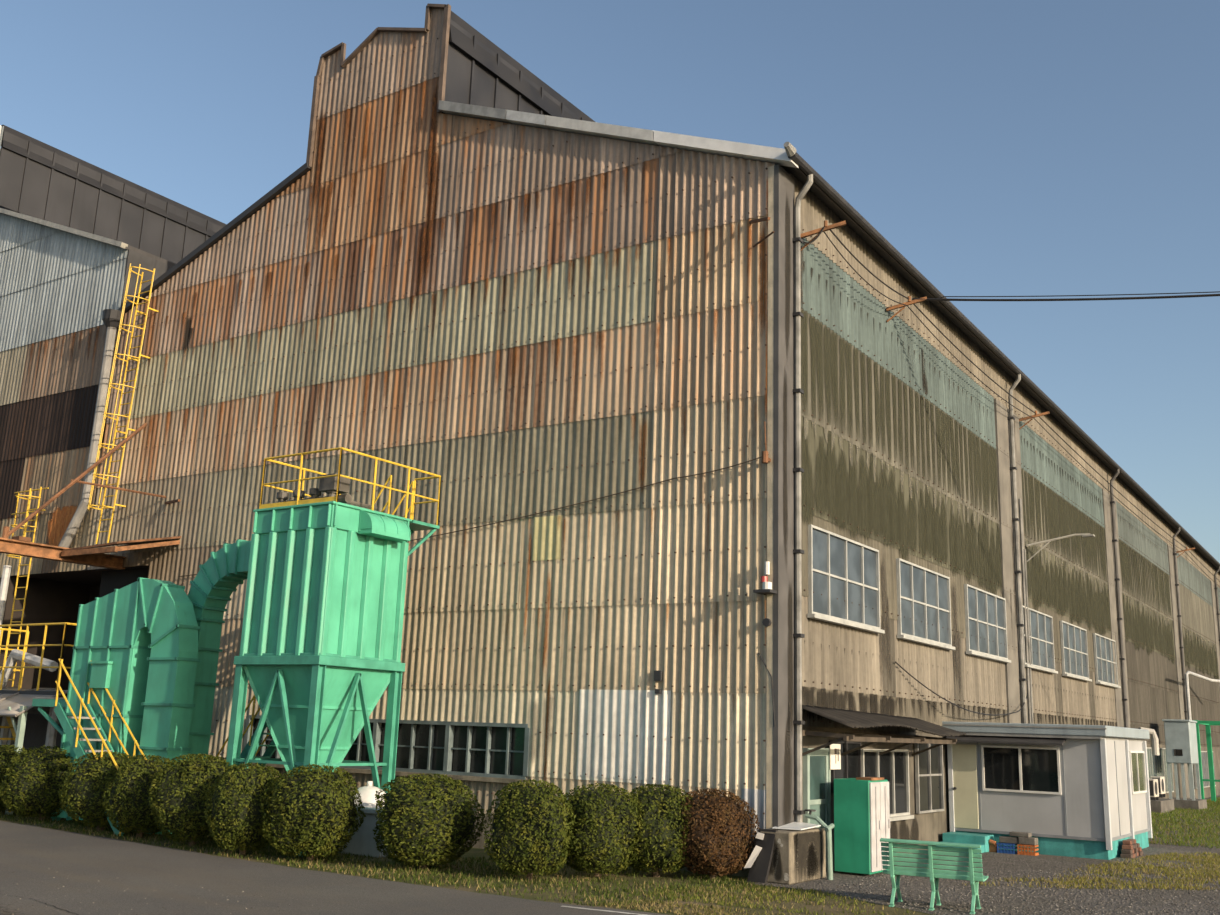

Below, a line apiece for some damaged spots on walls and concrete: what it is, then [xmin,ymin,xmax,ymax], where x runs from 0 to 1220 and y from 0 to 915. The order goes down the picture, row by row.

rust [295,115,334,280]
rust [410,81,459,317]
rust [432,278,488,335]
rust [474,191,539,235]
rust [568,248,619,292]
rust [730,181,768,414]
rust [633,416,646,491]
rust [524,538,550,663]
water stain [769,201,1219,880]